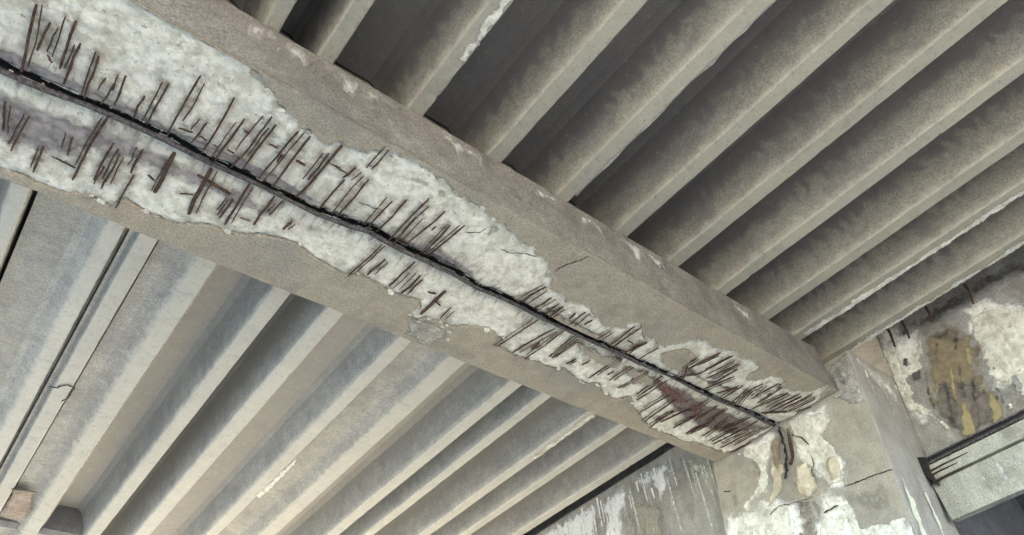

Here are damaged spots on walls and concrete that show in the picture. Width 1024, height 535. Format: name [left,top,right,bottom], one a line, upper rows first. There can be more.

rust [0,50,314,213]
crack [0,58,838,514]
spalling [0,0,844,484]
rust [401,240,472,274]
rust [638,370,763,433]
rust [771,439,780,467]
peeling [737,443,907,535]
peeling [884,339,951,431]
spalling [829,240,1024,403]
leakage [857,263,1024,436]